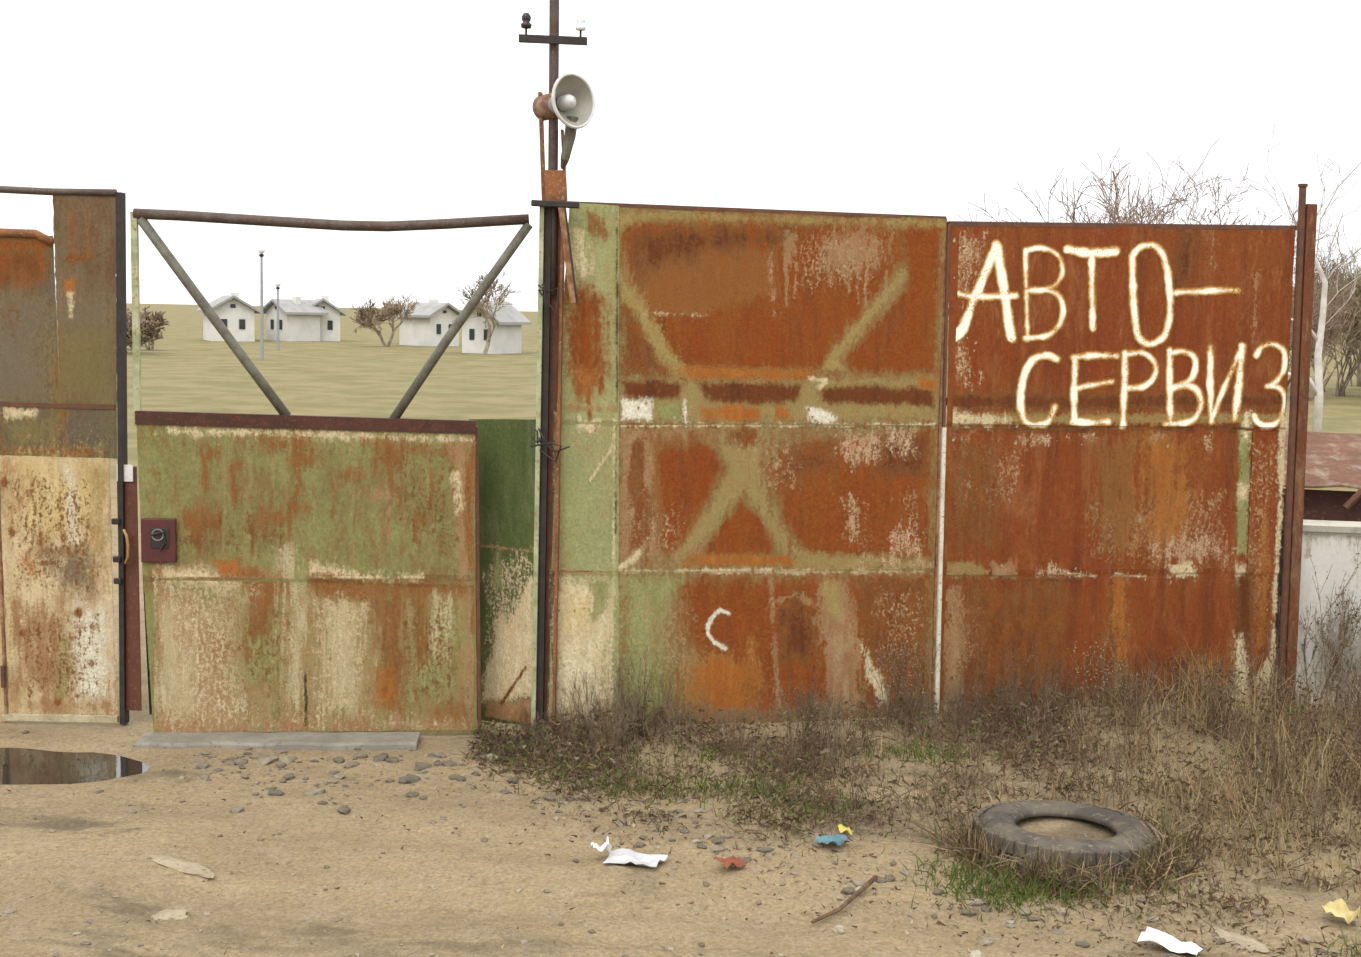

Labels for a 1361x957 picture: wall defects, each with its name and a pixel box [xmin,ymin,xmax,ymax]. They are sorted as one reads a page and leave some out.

peeling [619,210,988,292]
rust [1173,232,1198,289]
rust [549,211,967,724]
rust [953,392,1282,549]
rust [1108,572,1130,712]
rust [1235,514,1270,662]